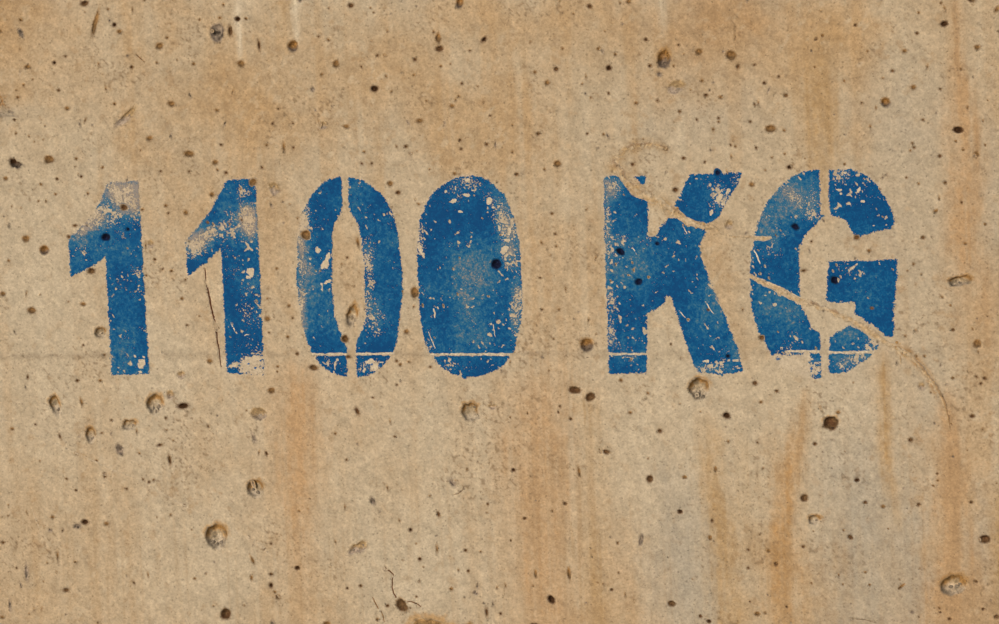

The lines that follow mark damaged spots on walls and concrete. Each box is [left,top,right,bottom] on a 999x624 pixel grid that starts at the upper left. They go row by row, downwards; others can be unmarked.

crack [600,133,770,241]
crack [202,269,223,368]
crack [749,275,951,430]